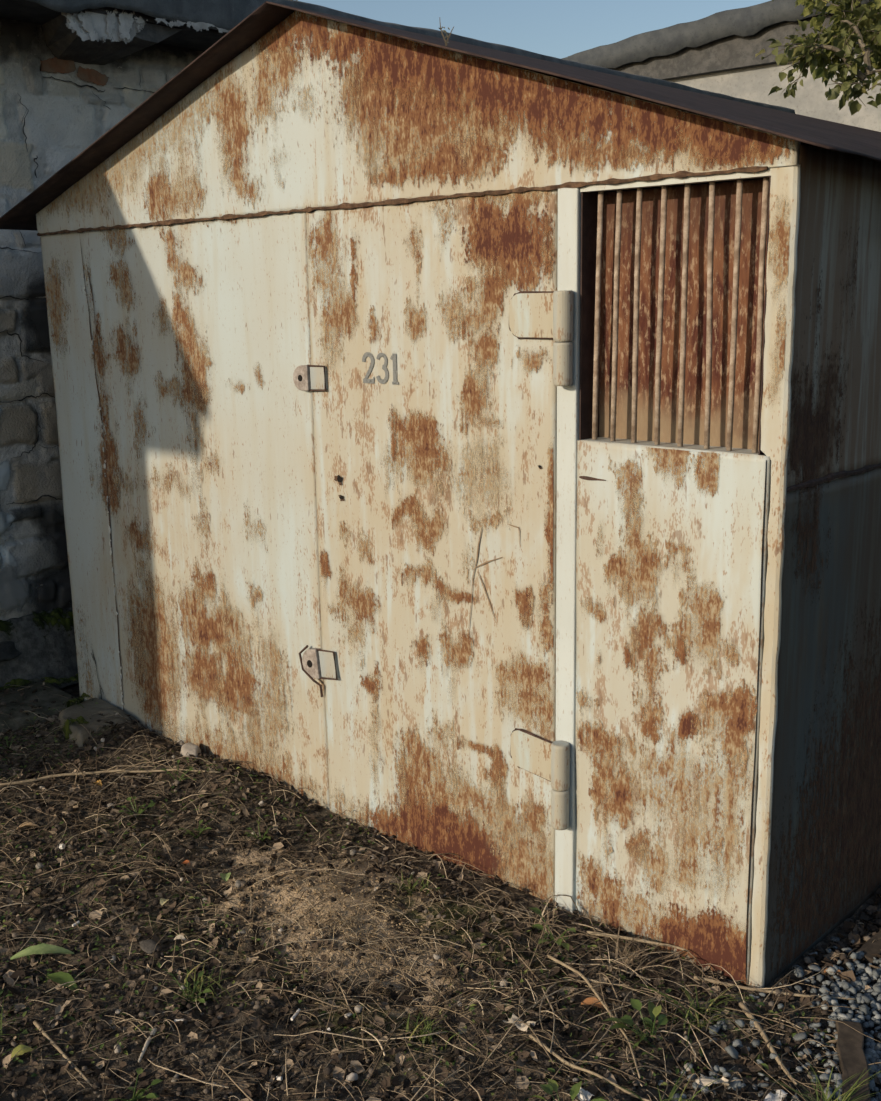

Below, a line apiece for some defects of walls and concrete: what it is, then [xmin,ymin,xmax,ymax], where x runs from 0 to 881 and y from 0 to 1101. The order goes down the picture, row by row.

spalling [61,9,230,44]
rust [38,11,795,903]
rust [576,447,757,985]
rust [768,196,849,503]